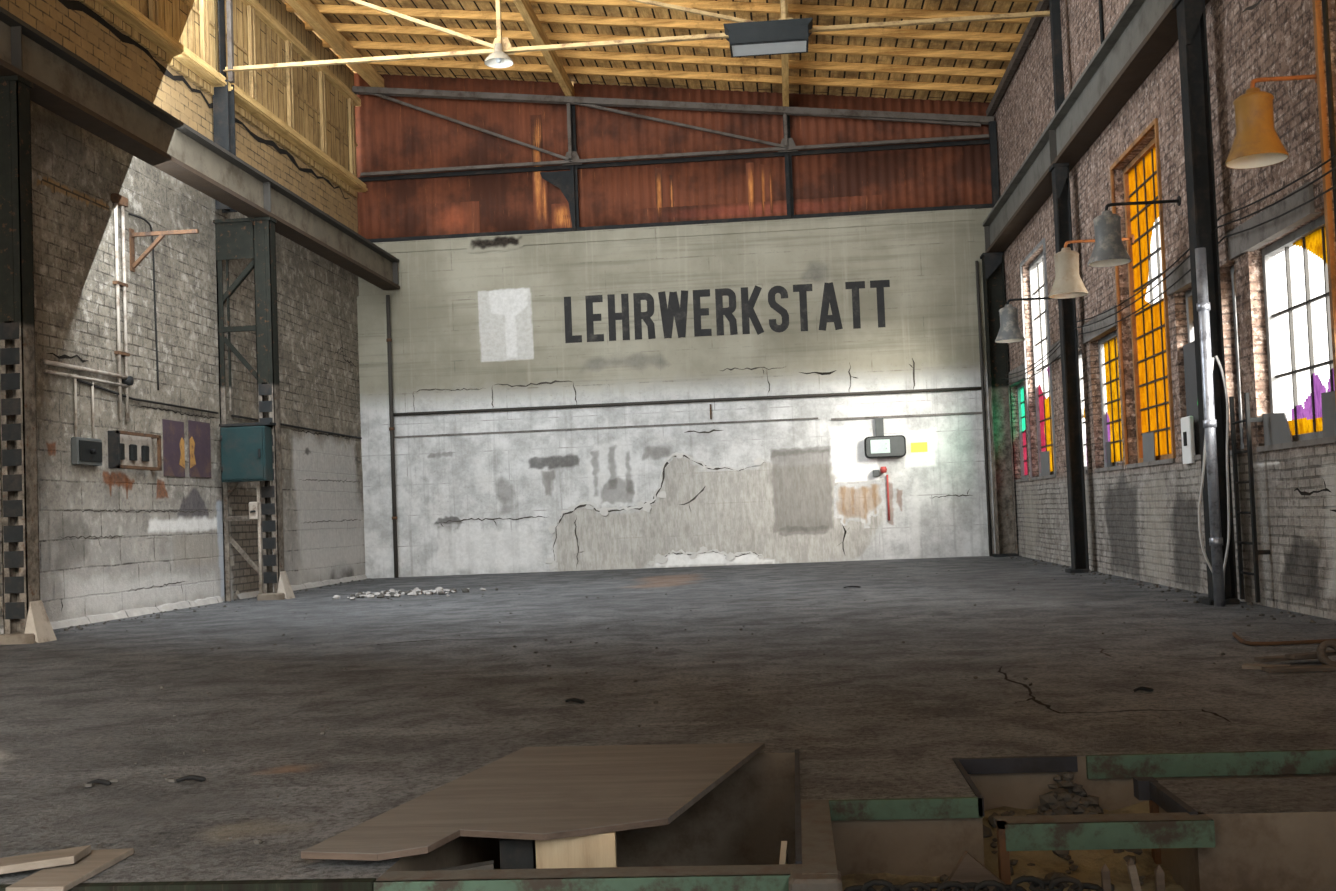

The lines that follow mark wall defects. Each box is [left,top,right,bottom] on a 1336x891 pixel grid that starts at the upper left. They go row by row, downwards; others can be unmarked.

flaking render [545,452,889,572]
damp [1101,457,1144,581]
damp [1165,479,1208,594]
crack [1294,479,1336,512]
crack [997,665,1232,723]